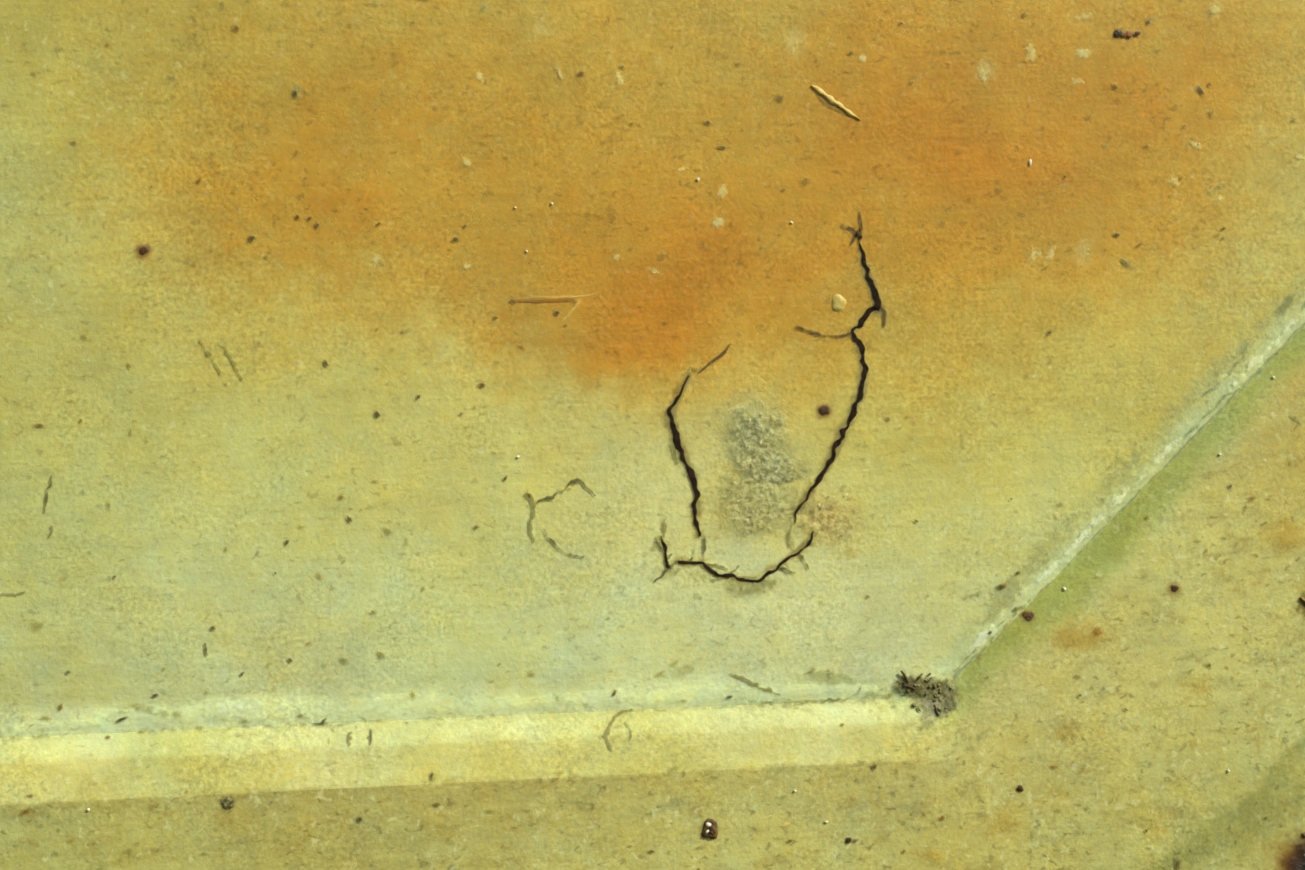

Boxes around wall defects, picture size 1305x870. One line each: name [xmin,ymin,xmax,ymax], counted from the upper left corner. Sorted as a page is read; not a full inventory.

corrosion [164,0,1268,385]
crack [652,211,887,594]